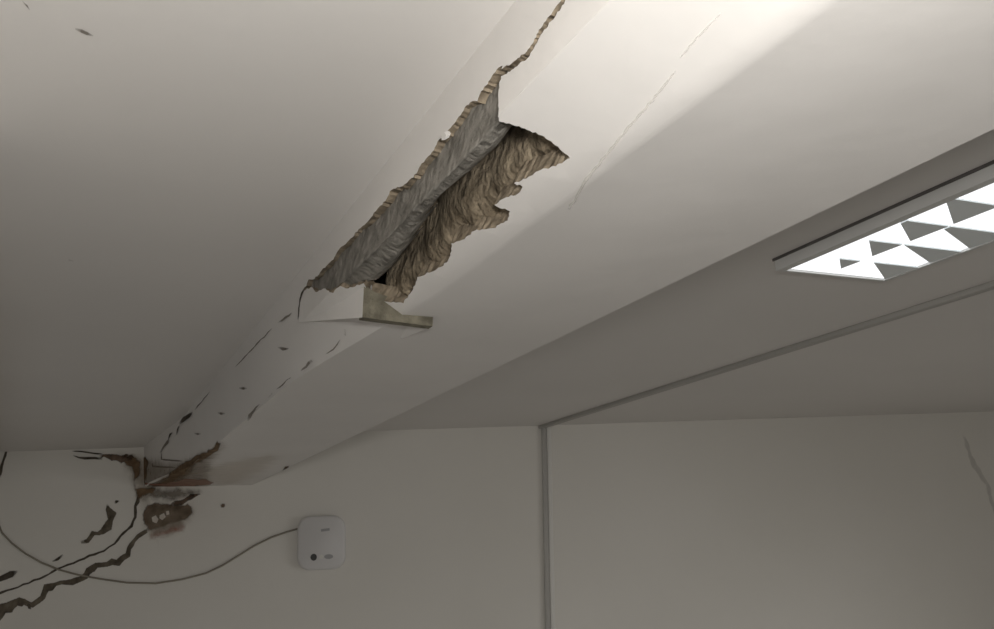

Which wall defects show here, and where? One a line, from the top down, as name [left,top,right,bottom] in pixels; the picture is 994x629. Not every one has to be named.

spalling [298,0,569,339]
crack [236,289,304,366]
crack [277,342,339,389]
crack [0,394,208,620]